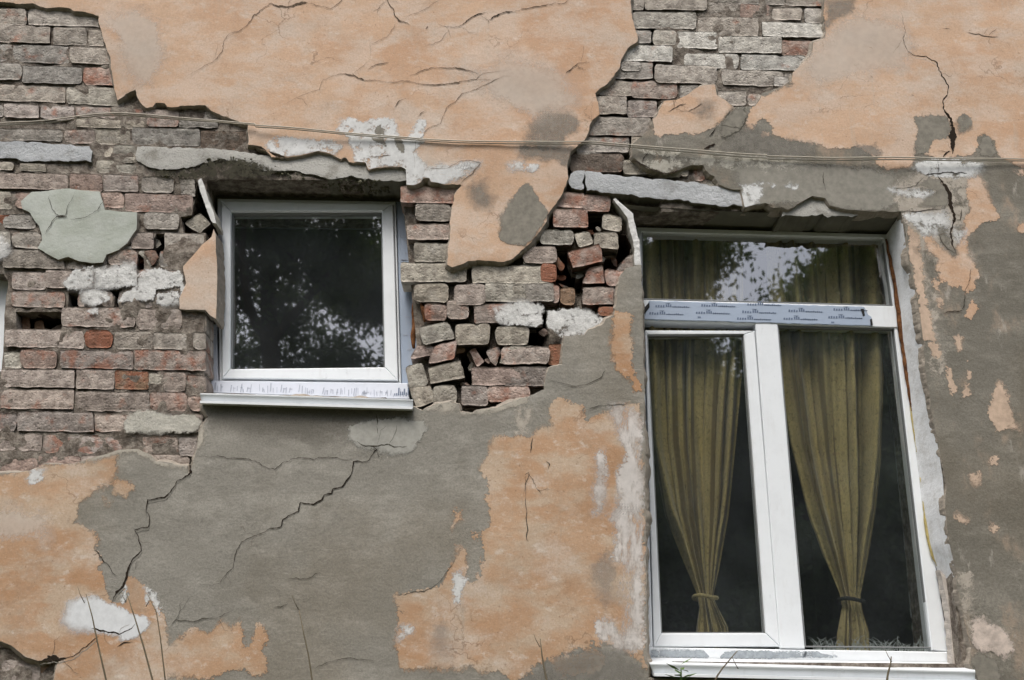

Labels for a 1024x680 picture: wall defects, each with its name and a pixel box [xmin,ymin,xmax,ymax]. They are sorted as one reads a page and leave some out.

crack [189,1,341,75]
crack [287,0,568,183]
spalling [666,168,715,186]
peeling [569,0,1024,178]
crack [894,18,971,314]
spalling [0,8,269,680]
crack [95,415,406,631]
peeling [275,166,648,680]
peeling [907,175,1000,397]
peeling [970,455,1000,486]
peeling [987,381,1020,432]
spalling [962,601,1015,680]